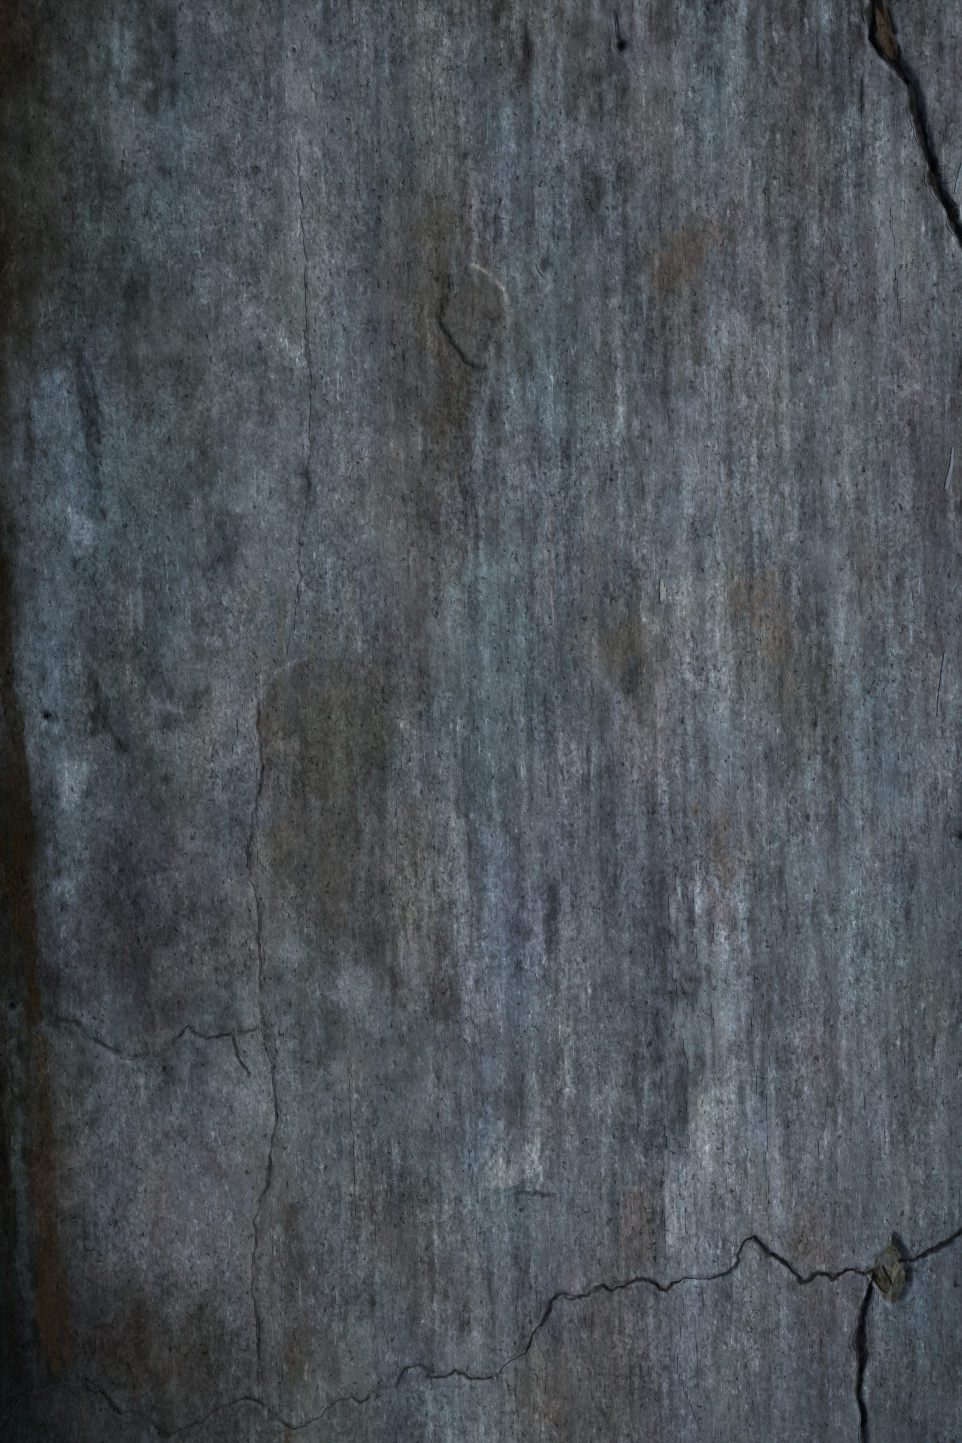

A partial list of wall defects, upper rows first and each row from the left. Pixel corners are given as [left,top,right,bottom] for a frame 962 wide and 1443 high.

spalling [873,0,904,68]
crack [862,0,962,250]
crack [42,148,315,1402]
crack [509,1189,560,1198]
spalling [865,1232,914,1307]
crack [898,1227,962,1264]
crack [0,1235,877,1443]